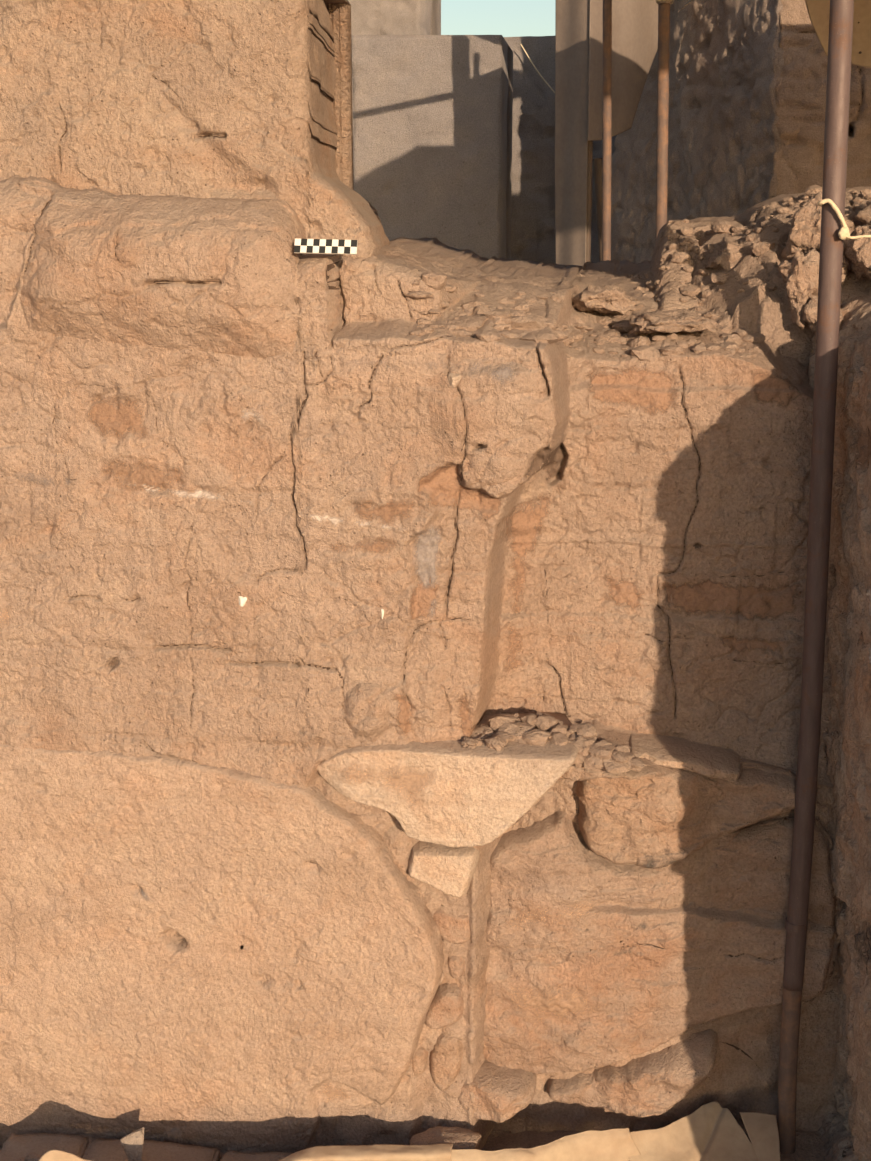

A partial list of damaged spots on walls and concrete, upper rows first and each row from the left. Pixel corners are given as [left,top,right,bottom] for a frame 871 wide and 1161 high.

crack [160,541,344,726]
crack [258,261,345,581]
crack [403,403,468,710]
crack [645,379,701,712]